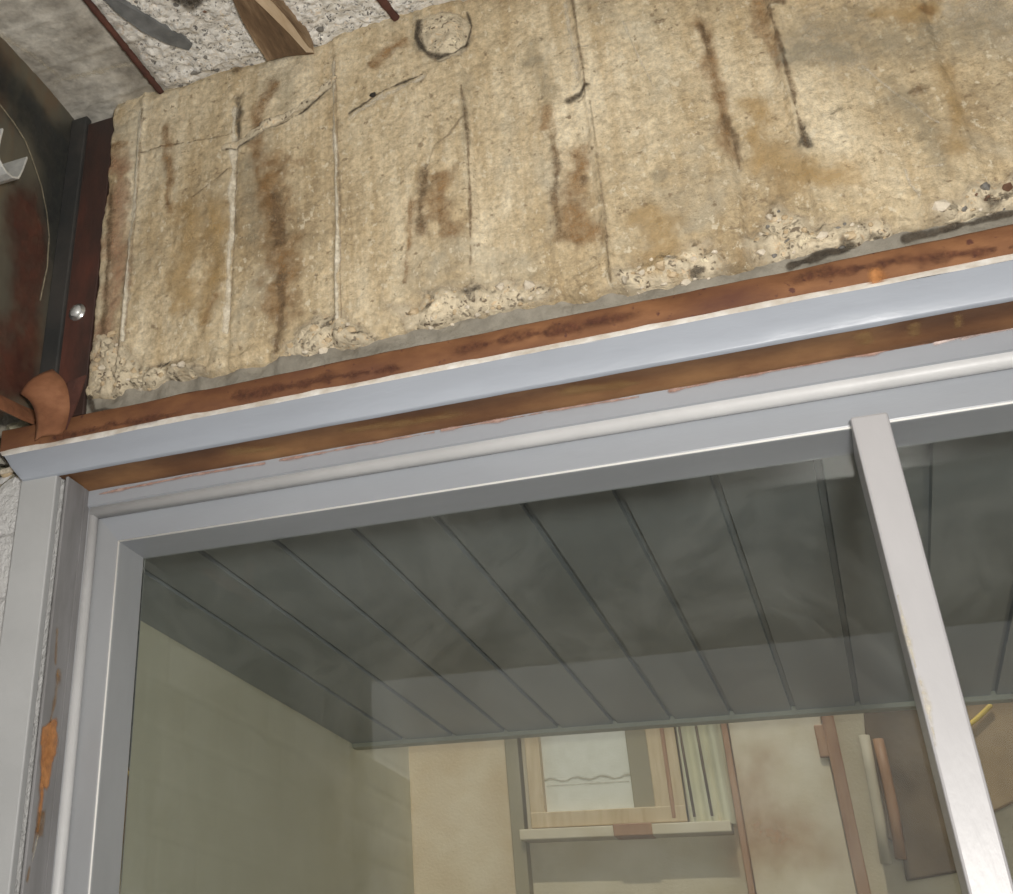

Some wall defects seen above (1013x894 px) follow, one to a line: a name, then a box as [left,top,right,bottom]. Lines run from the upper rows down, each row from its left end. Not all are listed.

spalling [91,0,267,89]
spalling [283,0,466,47]
damp [369,39,405,68]
crack [349,12,472,117]
crack [564,0,589,103]
crack [150,75,337,197]
corrosion [253,139,296,354]
corrosion [408,169,455,235]
corrosion [542,114,599,242]
spalling [743,206,893,265]
corrosion [0,224,1013,452]
spalling [0,254,1013,456]